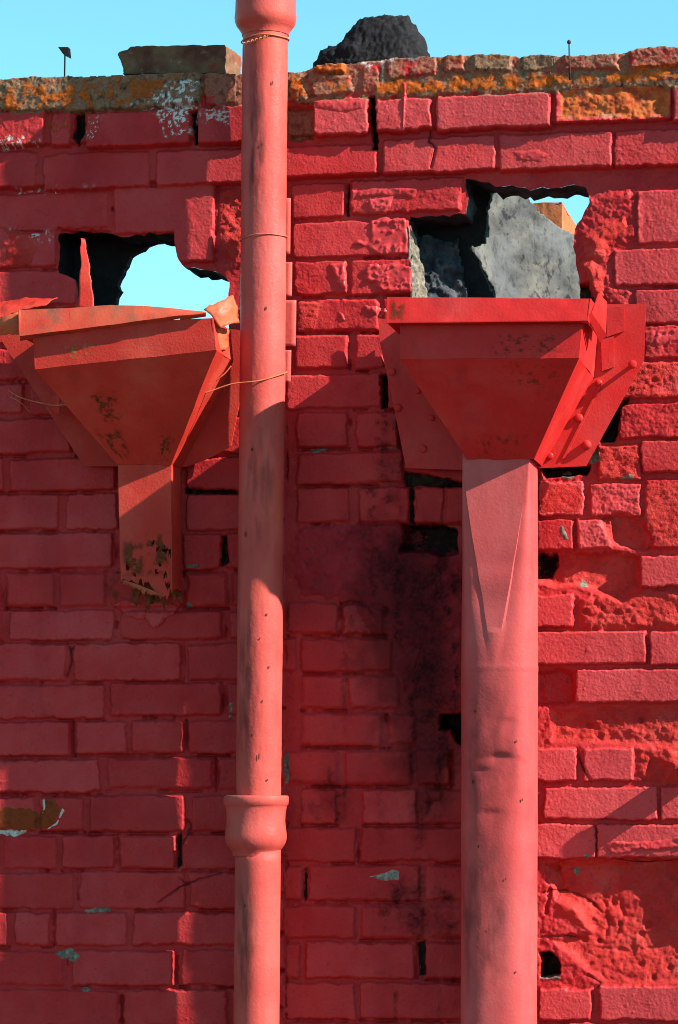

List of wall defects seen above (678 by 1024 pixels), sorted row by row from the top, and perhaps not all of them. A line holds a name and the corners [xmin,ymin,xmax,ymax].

water stain [148,80,228,134]
peeling [580,286,595,302]
peeling [645,328,678,346]
spalling [538,360,678,631]
spalling [549,703,678,786]
peeling [0,797,64,837]
crack [161,872,222,900]
peeling [370,869,399,881]
spalling [540,837,678,987]
peeling [55,948,80,962]